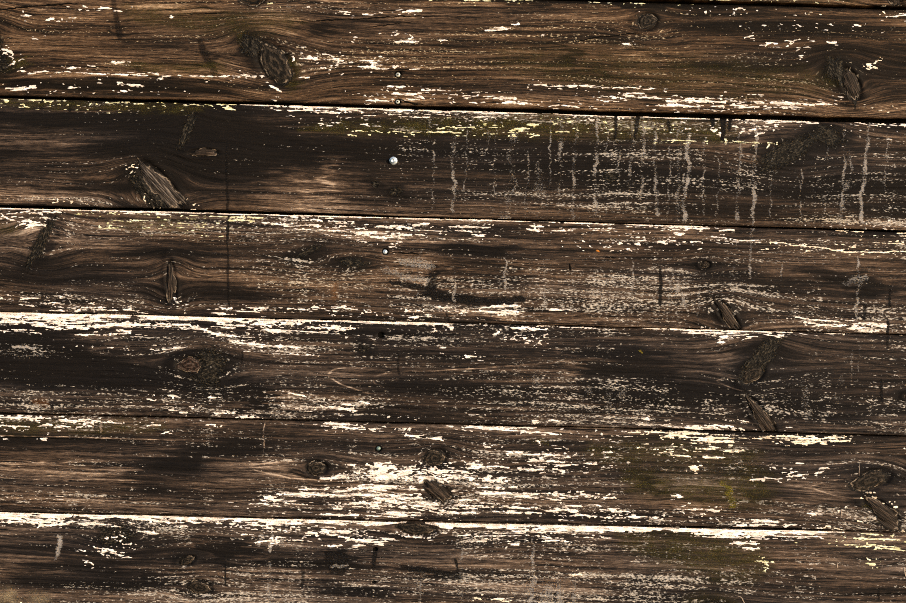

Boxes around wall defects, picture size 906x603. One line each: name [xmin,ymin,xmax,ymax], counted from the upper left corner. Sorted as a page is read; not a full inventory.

peeling [744,13,815,62]
peeling [0,45,843,149]
water stain [710,119,732,140]
peeling [0,196,906,257]
peeling [0,292,595,357]
peeling [643,312,906,343]
peeling [147,391,220,416]
peeling [200,410,263,427]
peeling [275,390,444,441]